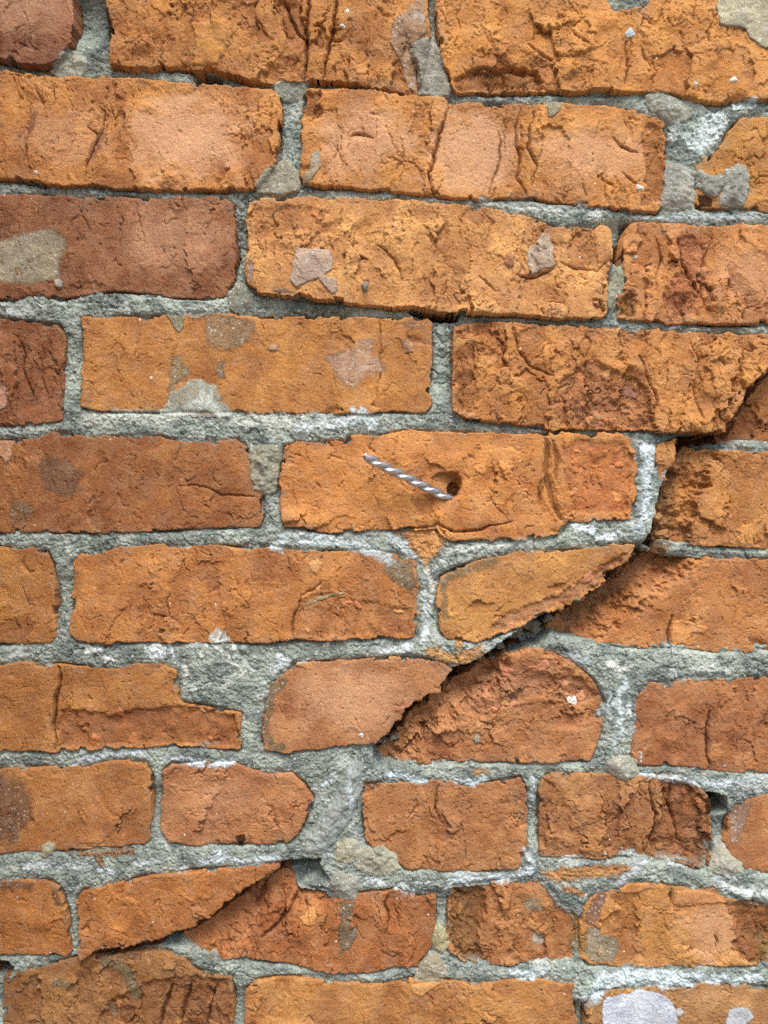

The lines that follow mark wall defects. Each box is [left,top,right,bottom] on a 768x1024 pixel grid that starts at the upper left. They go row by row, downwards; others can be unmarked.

crack [378,361,768,750]
crack [702,712,710,764]
crack [645,790,676,848]
crack [95,860,287,959]